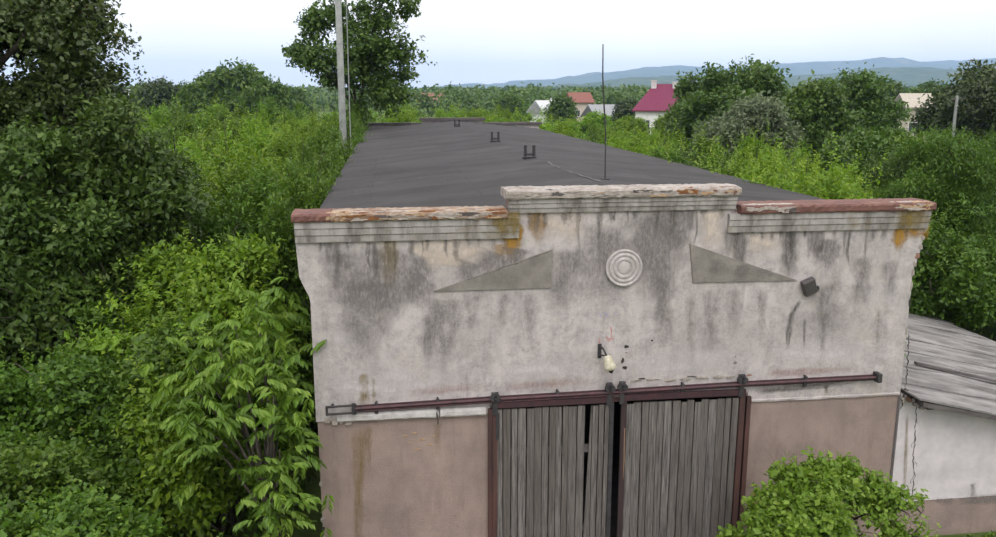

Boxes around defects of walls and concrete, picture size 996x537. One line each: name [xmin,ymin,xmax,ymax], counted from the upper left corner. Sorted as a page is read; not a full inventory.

peeling [326,208,505,222]
rust [494,212,540,255]
rust [894,210,928,246]
peeling [889,200,934,211]
water stain [782,231,866,289]
water stain [320,241,433,341]